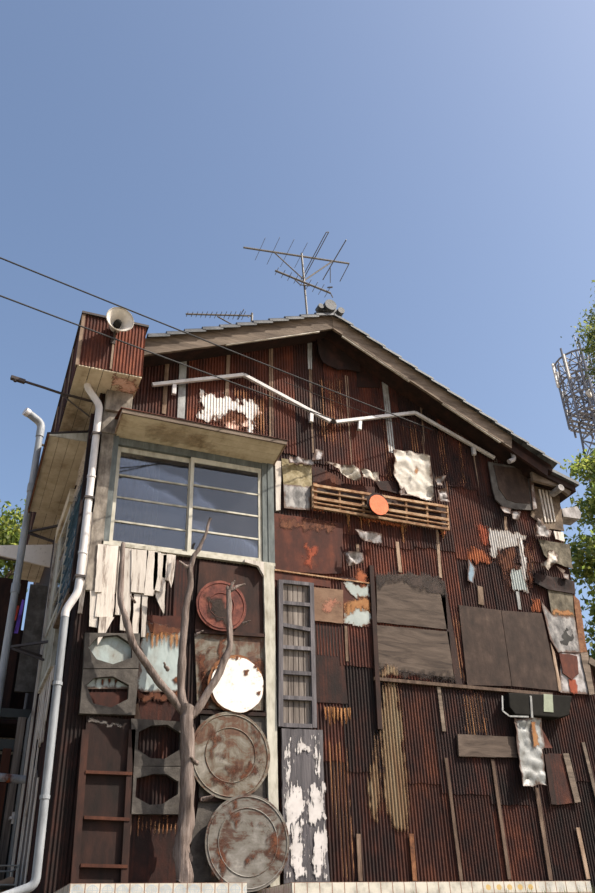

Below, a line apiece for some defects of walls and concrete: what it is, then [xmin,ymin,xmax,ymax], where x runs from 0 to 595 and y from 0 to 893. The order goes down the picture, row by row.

peeling [196,389,263,433]
rust [280,509,336,533]
rust [304,543,318,569]
rust [466,524,534,588]
peeling [488,528,529,594]
rust [198,638,241,708]
rust [244,658,265,695]
rust [210,727,261,789]
rust [222,799,241,827]
peeling [284,733,328,881]
rust [211,840,230,883]
rust [245,824,287,864]